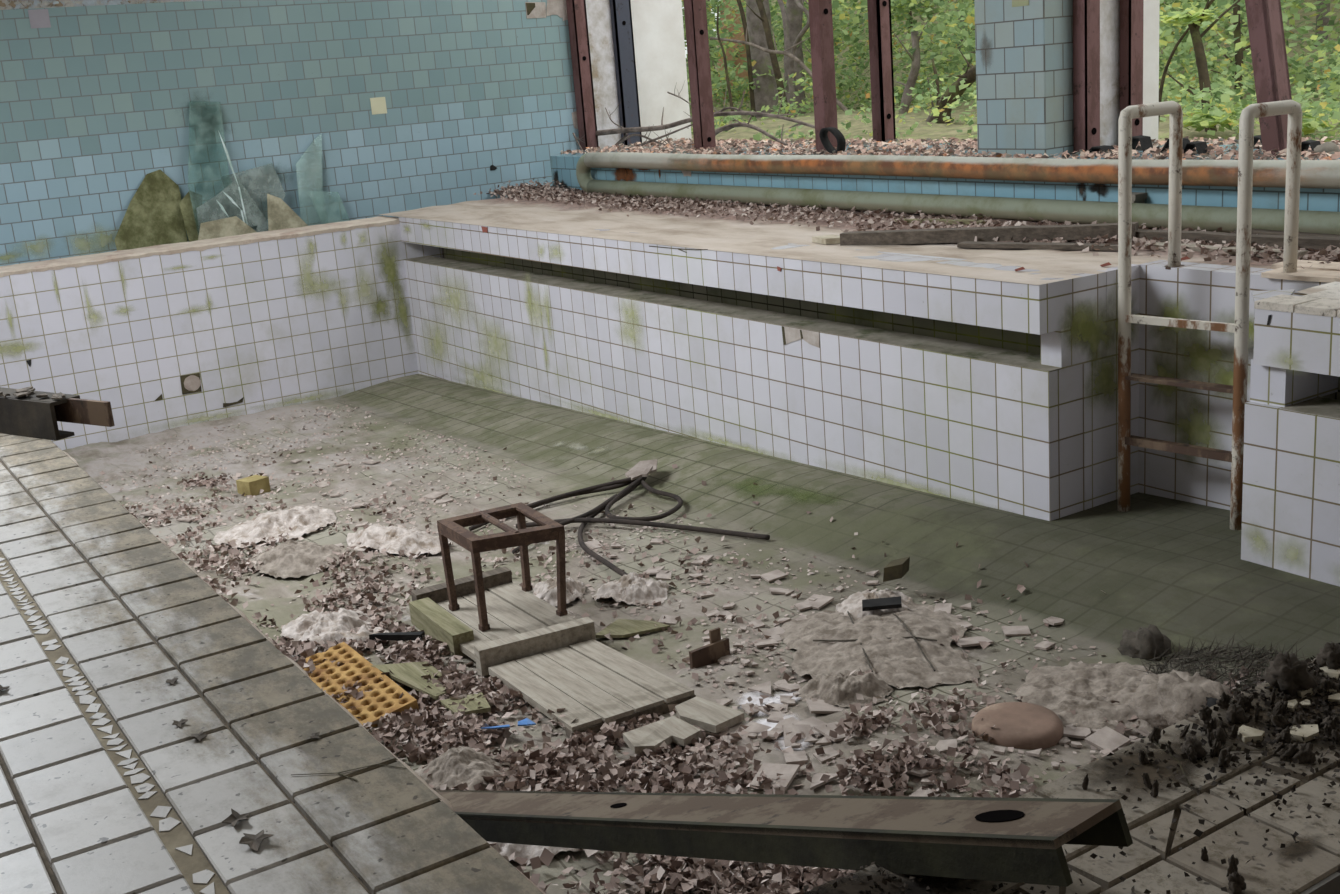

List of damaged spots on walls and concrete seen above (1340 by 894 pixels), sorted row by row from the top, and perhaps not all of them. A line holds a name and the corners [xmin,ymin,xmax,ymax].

spalling [525,0,568,21]
peeling [180,373,202,395]